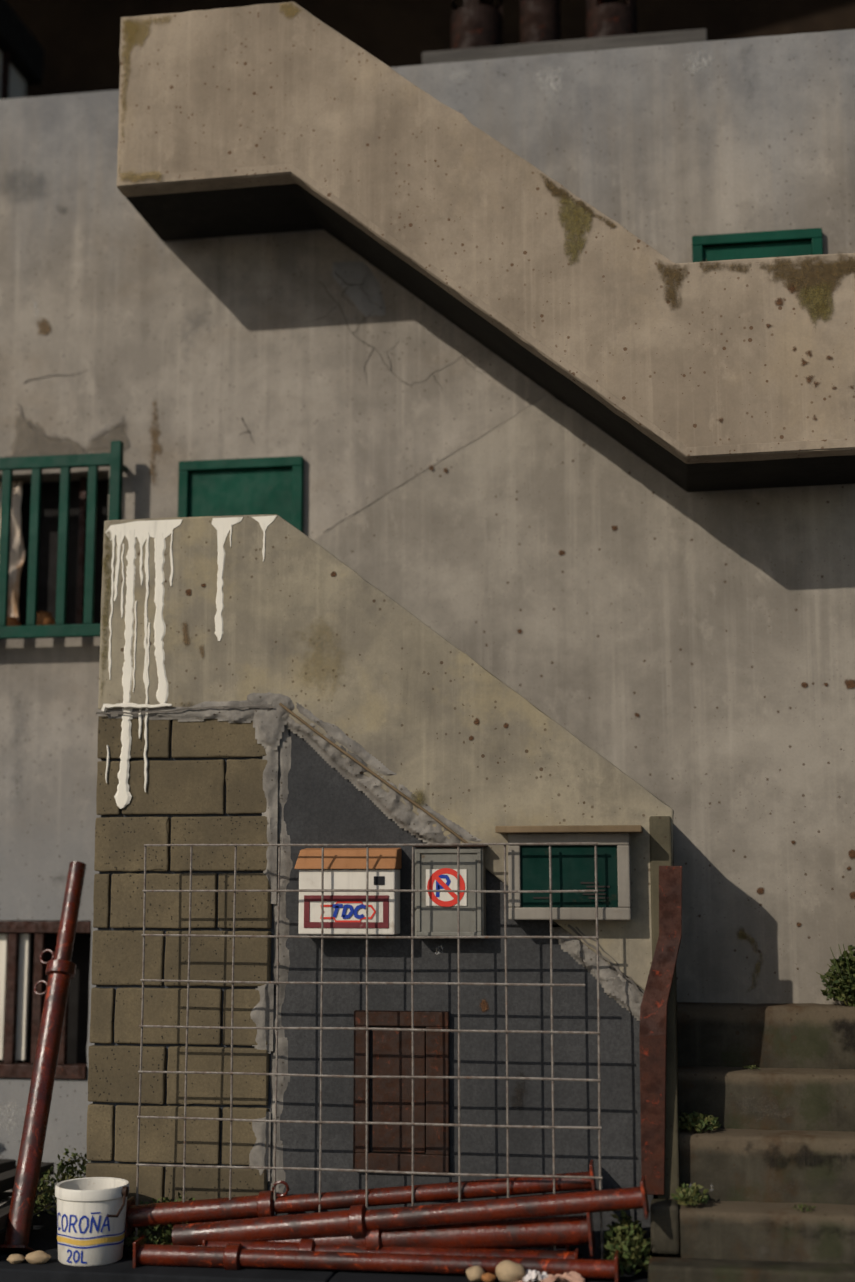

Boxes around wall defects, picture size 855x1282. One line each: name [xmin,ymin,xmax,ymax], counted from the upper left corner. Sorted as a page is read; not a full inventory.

peeling [8,404,131,457]
water stain [101,530,174,809]
water stain [215,524,232,641]
spalling [96,692,482,1194]